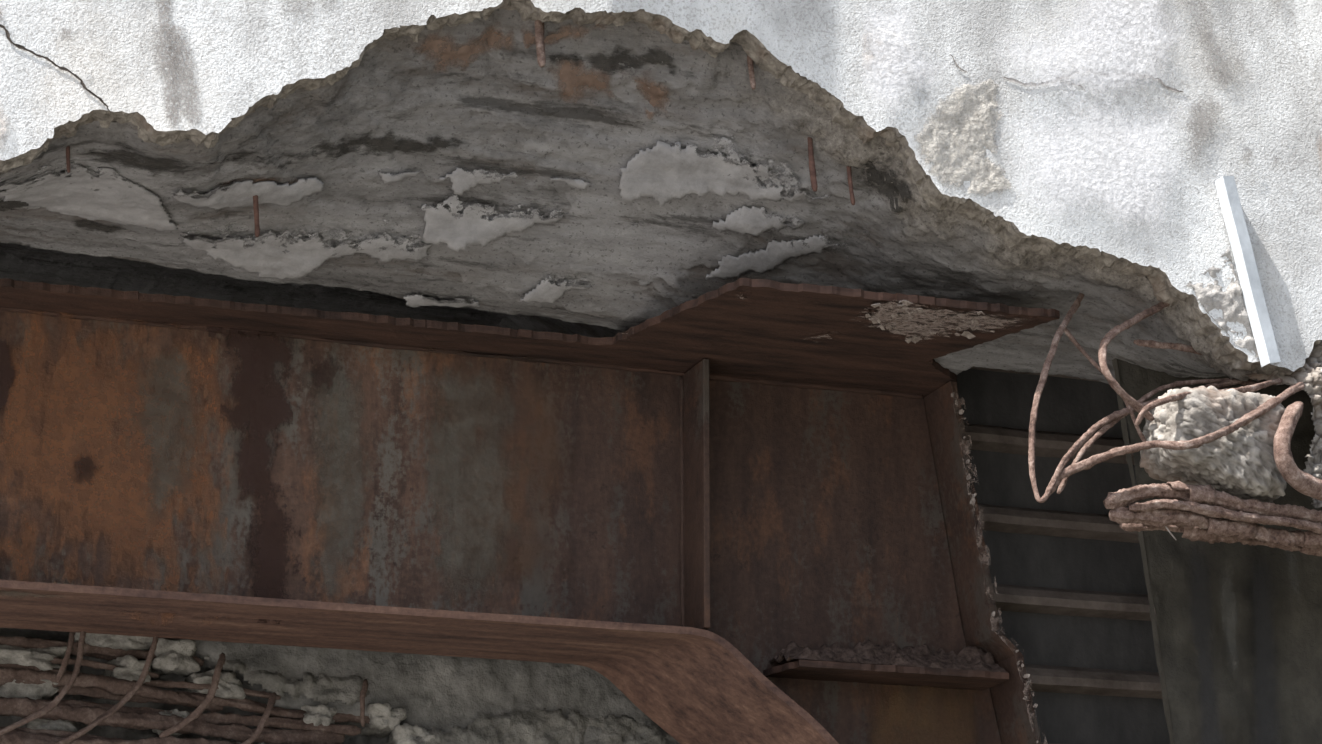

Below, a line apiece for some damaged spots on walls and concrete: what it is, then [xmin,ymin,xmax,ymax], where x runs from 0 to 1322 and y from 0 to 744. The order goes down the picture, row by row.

crack [0,11,110,111]
leakage [155,0,199,125]
spalling [0,9,1322,565]
rust [74,457,98,484]
rust [206,326,305,599]
spalling [0,631,680,744]